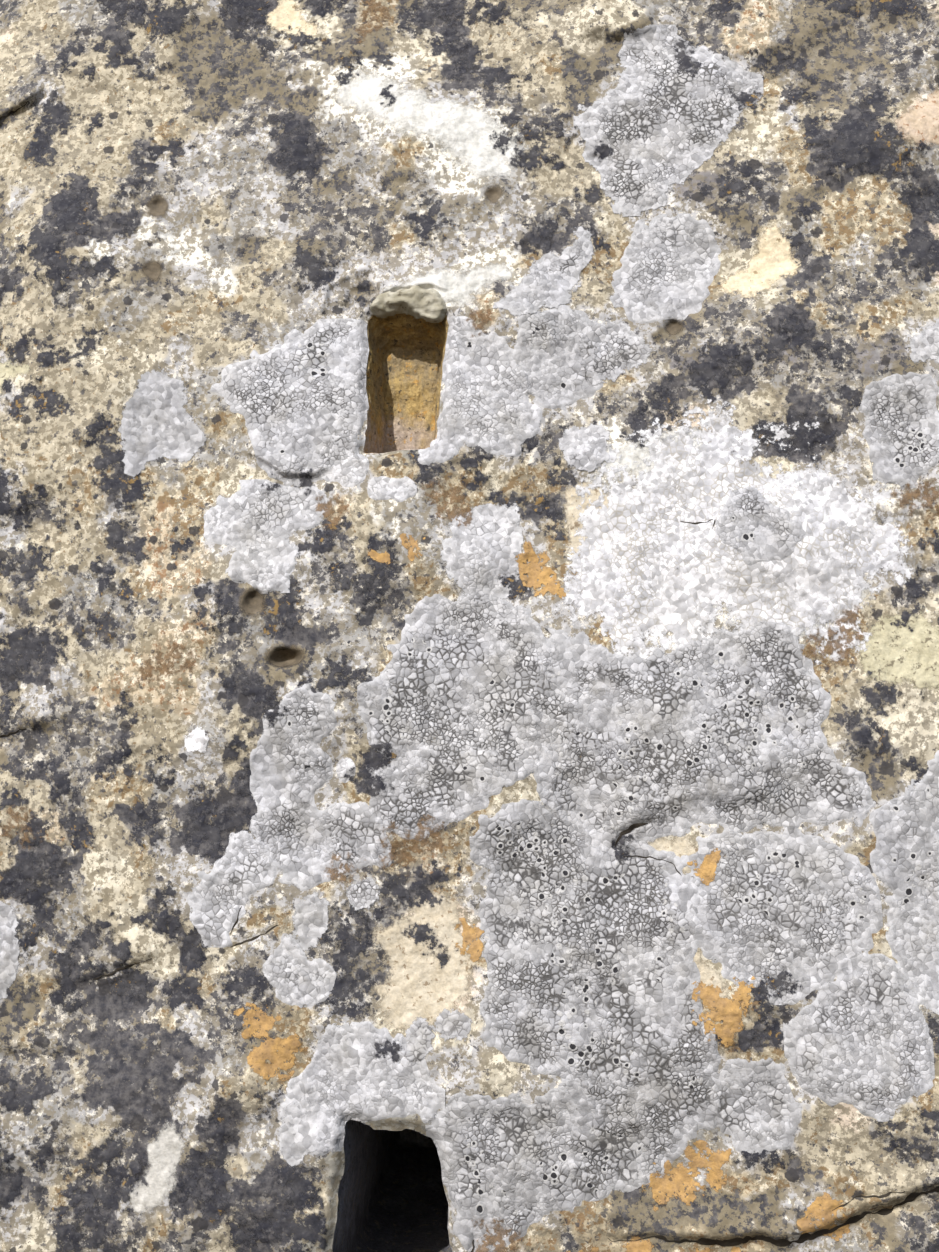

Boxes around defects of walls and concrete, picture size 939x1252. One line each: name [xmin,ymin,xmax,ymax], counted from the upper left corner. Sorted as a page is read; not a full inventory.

crack [608,1187,939,1247]